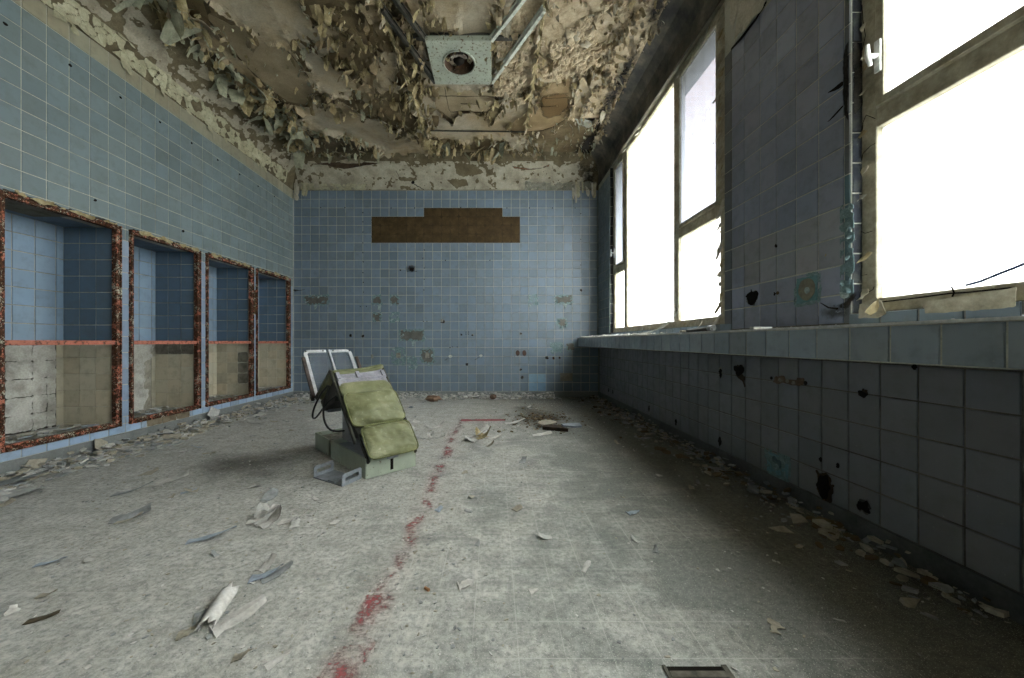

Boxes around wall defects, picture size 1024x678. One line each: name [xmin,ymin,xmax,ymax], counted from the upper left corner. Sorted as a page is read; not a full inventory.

peeling [78,0,670,203]
peeling [684,0,767,327]
peeling [371,208,520,243]
peeling [839,194,886,318]
peeling [554,289,582,329]
peeling [922,287,1017,313]
peeling [398,329,436,366]
spalling [816,457,840,503]